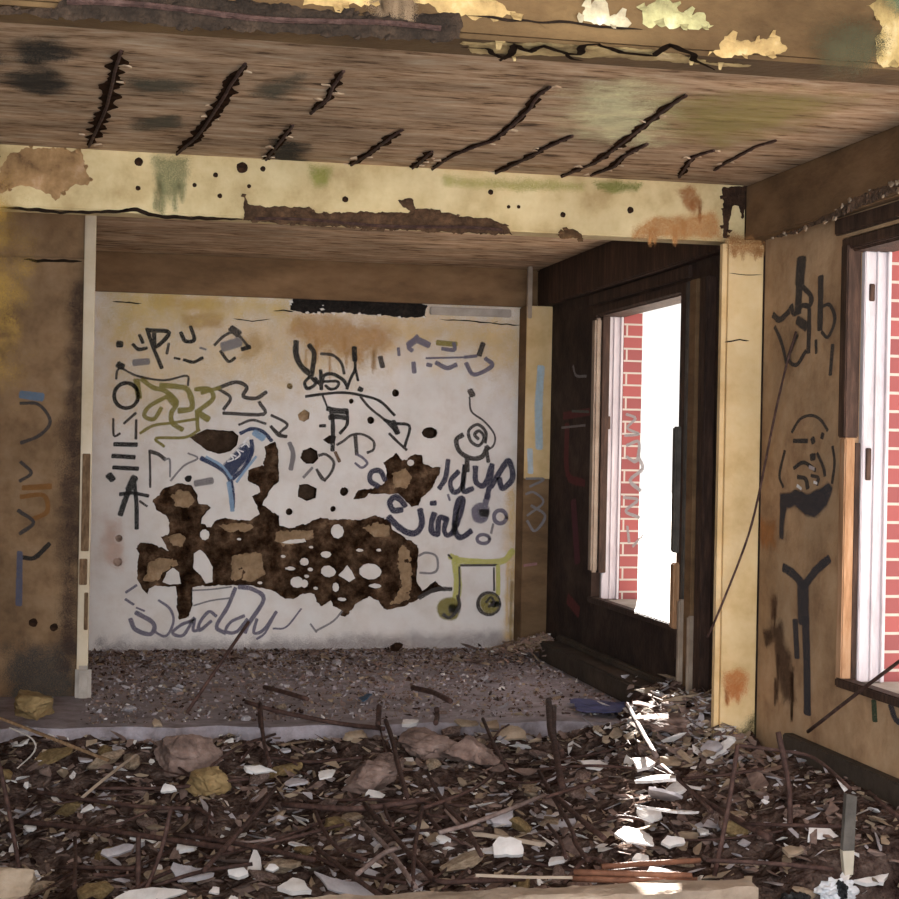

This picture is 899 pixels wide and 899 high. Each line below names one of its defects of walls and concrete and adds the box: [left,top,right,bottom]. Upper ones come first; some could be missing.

spalling [0,0,787,70]
flaking render [0,49,132,201]
spalling [176,62,252,156]
spalling [309,70,345,115]
spalling [344,129,404,166]
spalling [409,85,562,171]
spalling [488,135,574,175]
spalling [560,94,688,178]
spalling [677,139,777,179]
rust [631,185,766,261]
flaking render [136,442,442,620]